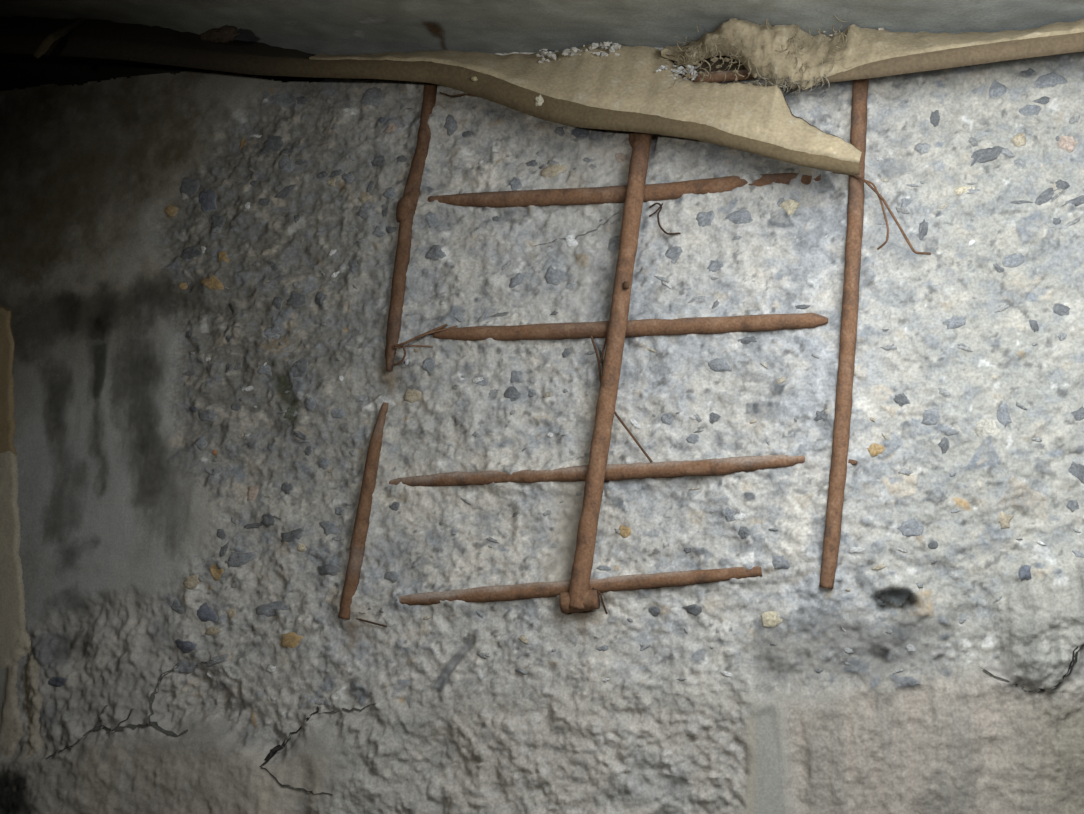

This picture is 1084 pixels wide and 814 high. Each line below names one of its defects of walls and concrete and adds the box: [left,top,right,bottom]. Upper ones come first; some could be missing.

damp [91,338,162,401]
spalling [154,51,1084,752]
crack [45,654,228,759]
crack [259,703,376,796]
spalling [302,691,748,814]
spalling [787,676,1084,814]
crack [980,644,1084,692]